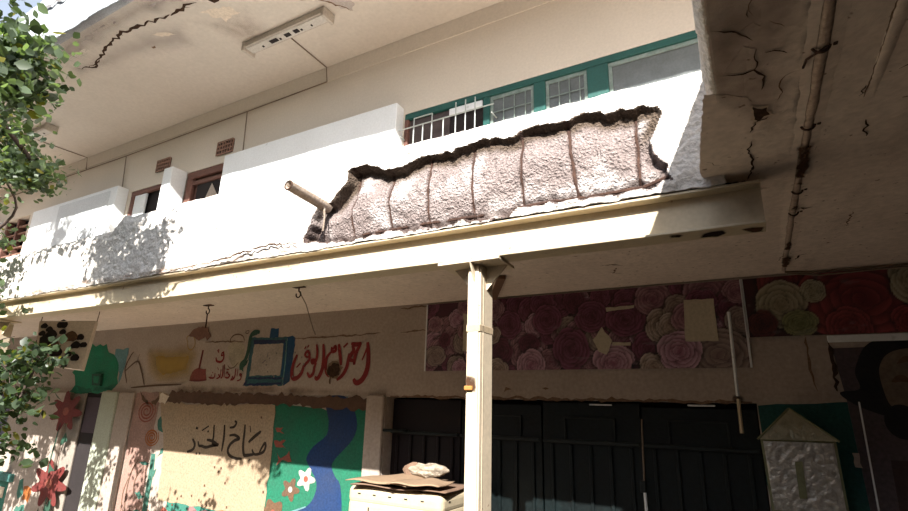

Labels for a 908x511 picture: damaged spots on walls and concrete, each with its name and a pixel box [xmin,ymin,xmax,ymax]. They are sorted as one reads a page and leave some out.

crack [78,0,219,69]
peeling [320,0,355,11]
crack [707,0,802,186]
spalling [303,104,673,245]
flaking render [699,94,774,179]
rust [796,146,812,185]
crack [796,337,839,391]